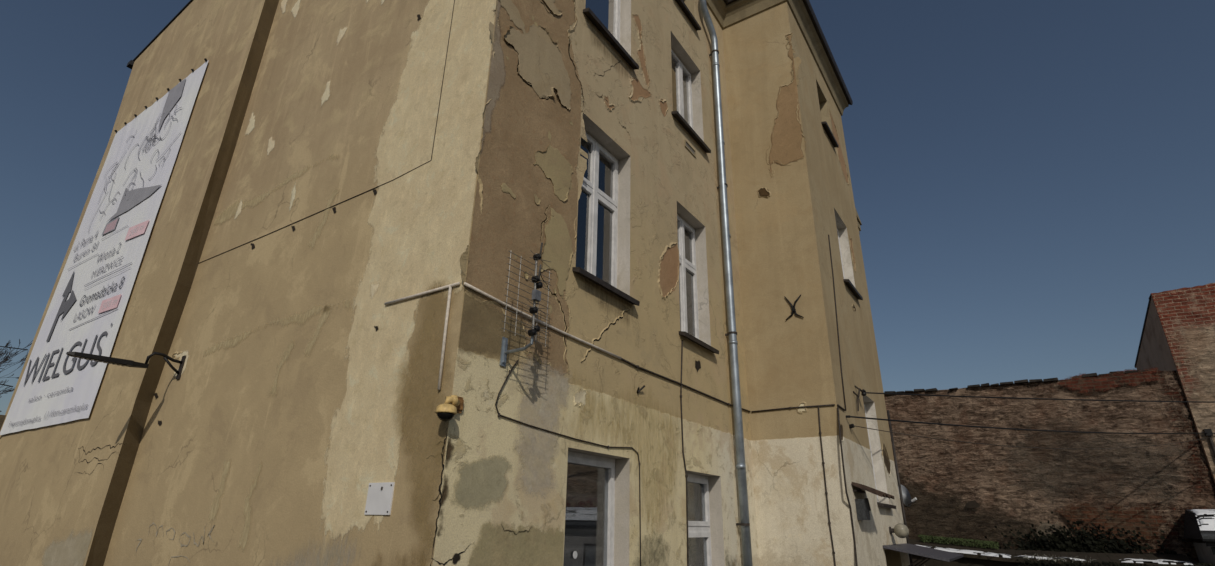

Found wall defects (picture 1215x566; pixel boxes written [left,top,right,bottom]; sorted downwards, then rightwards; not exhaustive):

peeling [281,0,301,17]
peeling [245,112,255,135]
flaking render [628,13,668,116]
flaking render [757,33,806,198]
peeling [320,0,588,541]
crack [540,273,632,372]
flaking render [657,242,680,300]
leakage [399,291,446,566]
crack [426,428,469,566]
leakage [468,523,564,566]